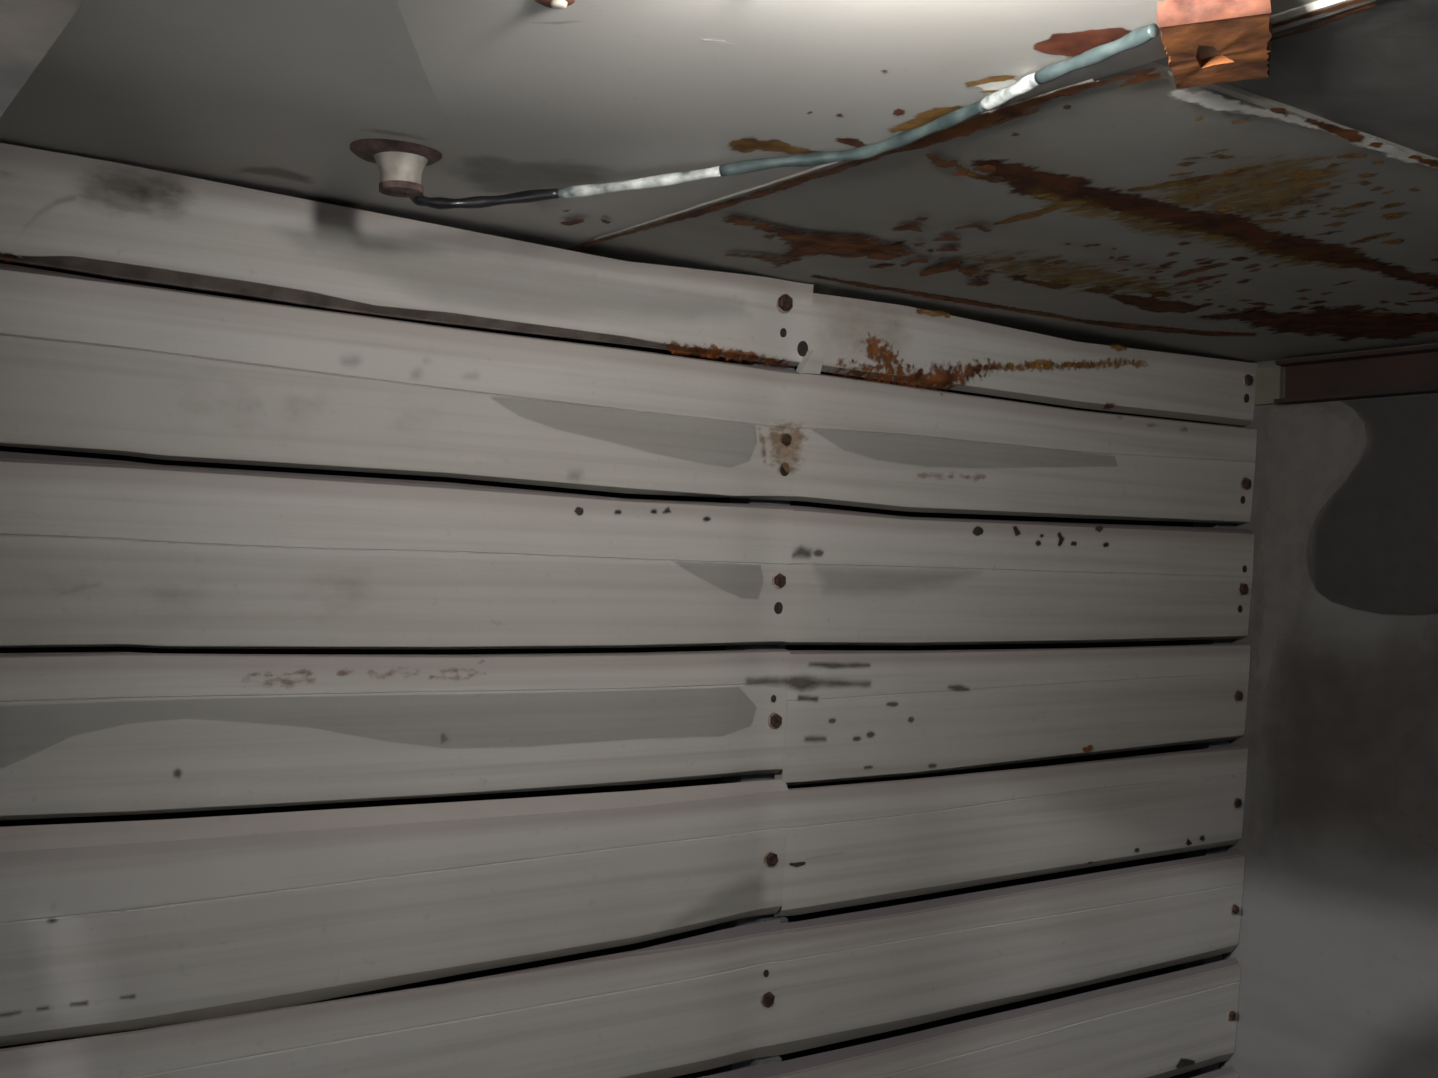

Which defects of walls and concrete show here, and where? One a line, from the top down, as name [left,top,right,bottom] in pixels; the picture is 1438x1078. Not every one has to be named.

rust [560,68,1438,395]
peeling [1171,90,1337,135]
peeling [1352,133,1438,169]
leakage [1307,394,1438,615]